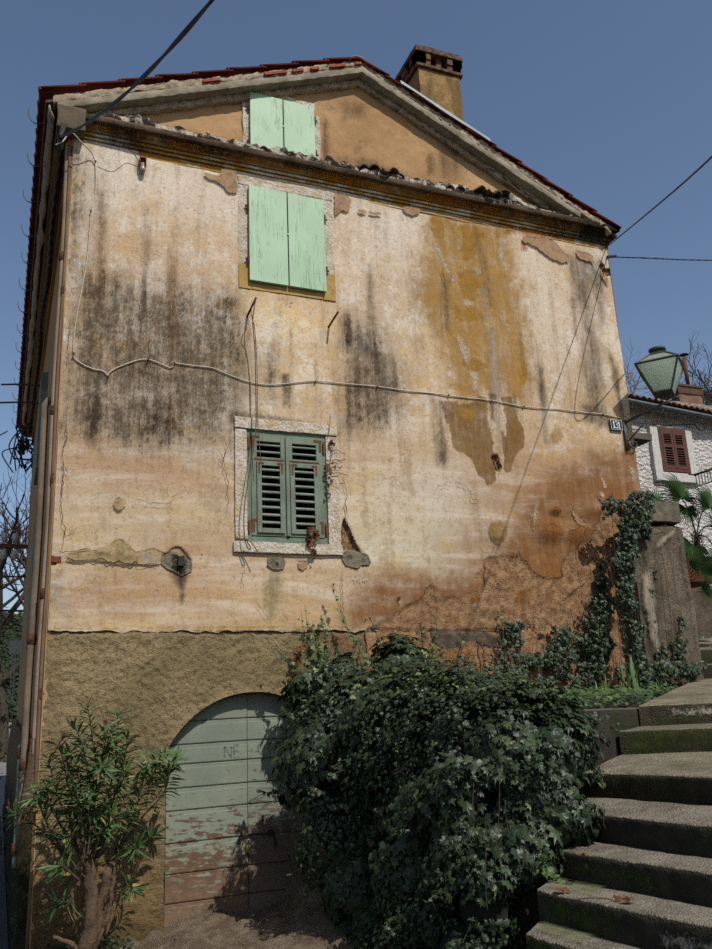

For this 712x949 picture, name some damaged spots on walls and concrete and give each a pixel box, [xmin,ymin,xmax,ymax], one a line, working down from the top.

flaking render [576,250,610,286]
water stain [61,270,244,453]
water stain [345,314,400,429]
flaking render [51,539,192,566]
flaking render [341,518,371,568]
flaking render [365,508,632,693]